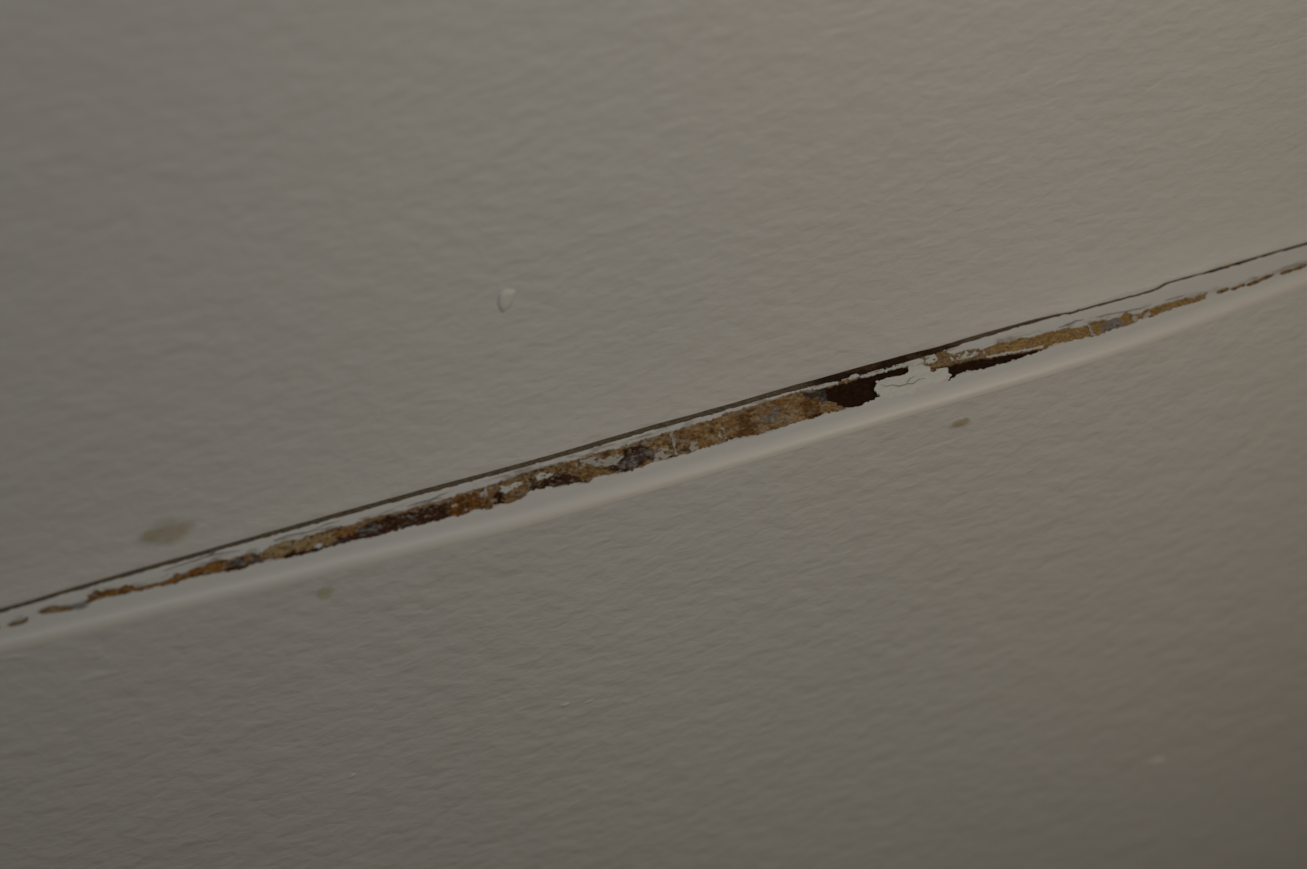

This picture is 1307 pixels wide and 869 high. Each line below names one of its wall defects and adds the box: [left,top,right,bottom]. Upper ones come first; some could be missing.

crack [0,242,1307,613]
peeling [8,265,1306,626]